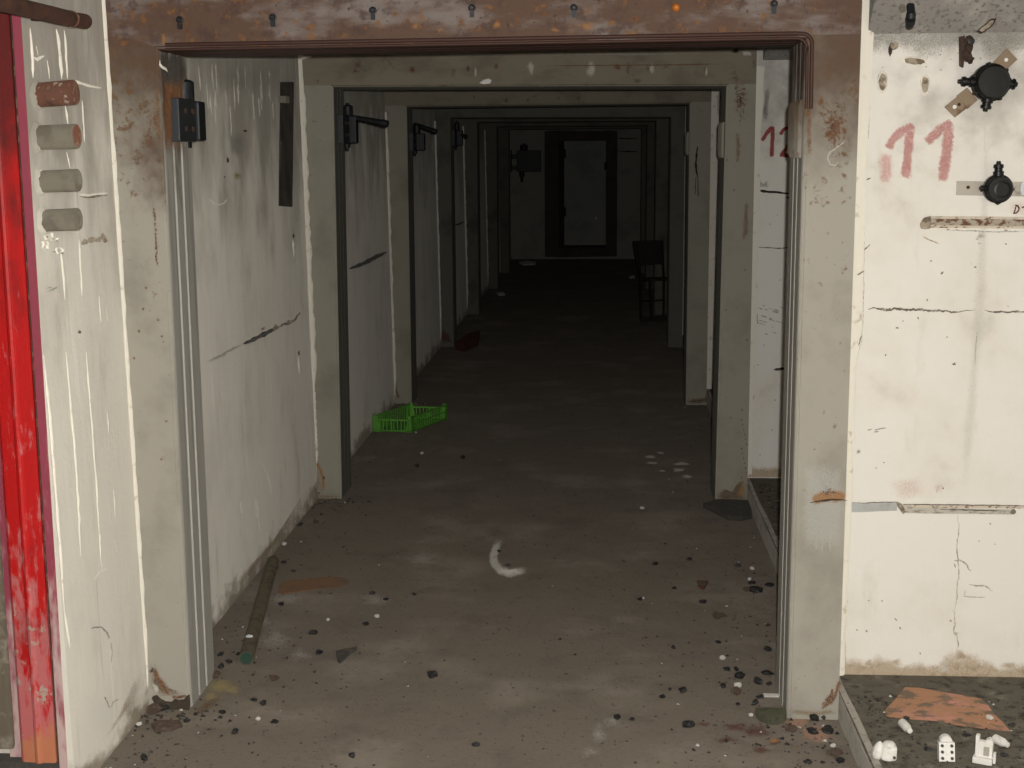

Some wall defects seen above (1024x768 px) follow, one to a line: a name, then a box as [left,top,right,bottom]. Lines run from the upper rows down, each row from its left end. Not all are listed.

rust [143,35,185,155]
rust [806,96,849,157]
crack [349,251,386,269]
crack [857,232,1024,359]
crack [207,313,300,363]
crack [949,514,992,649]
damp [845,640,1024,677]
spalling [152,694,190,710]